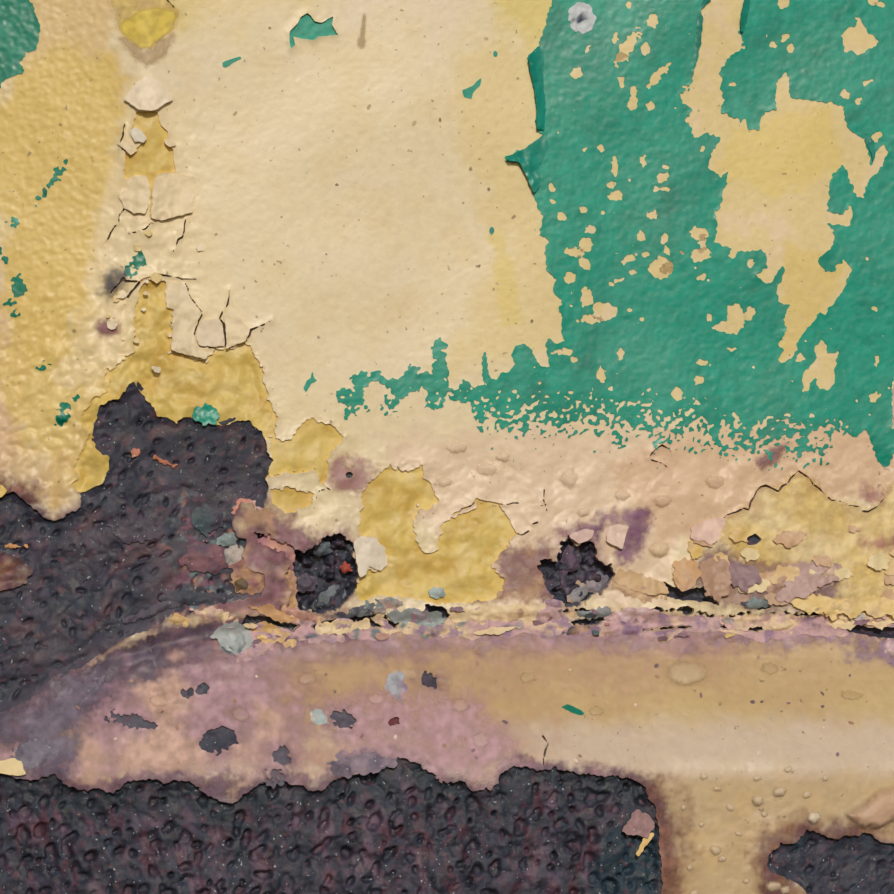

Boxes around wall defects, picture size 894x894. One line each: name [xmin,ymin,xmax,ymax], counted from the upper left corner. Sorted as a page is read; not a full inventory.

peeling [607,0,888,392]
crack [106,208,150,241]
crack [110,277,140,298]
crack [160,274,229,348]
peeling [564,225,644,324]
peeling [551,347,578,363]
crack [723,471,883,518]
peeling [353,465,518,612]
peeling [569,529,594,544]
peeling [721,473,894,602]
peeling [0,758,26,776]
peeling [622,809,655,856]